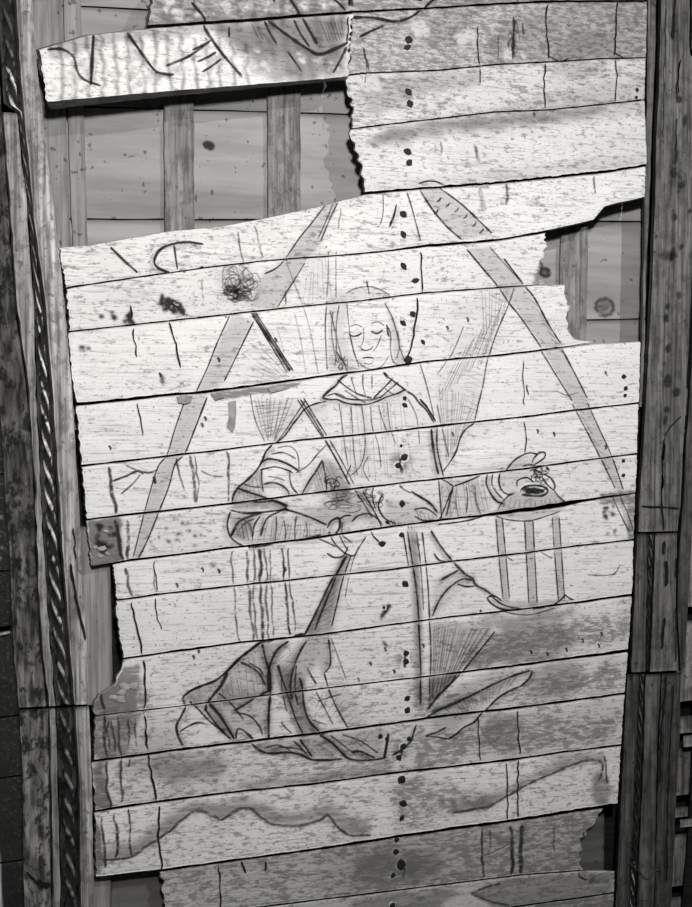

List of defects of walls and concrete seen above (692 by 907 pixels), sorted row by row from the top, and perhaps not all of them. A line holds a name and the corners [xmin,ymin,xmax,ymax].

peeling [163,0,183,20]
peeling [219,0,252,14]